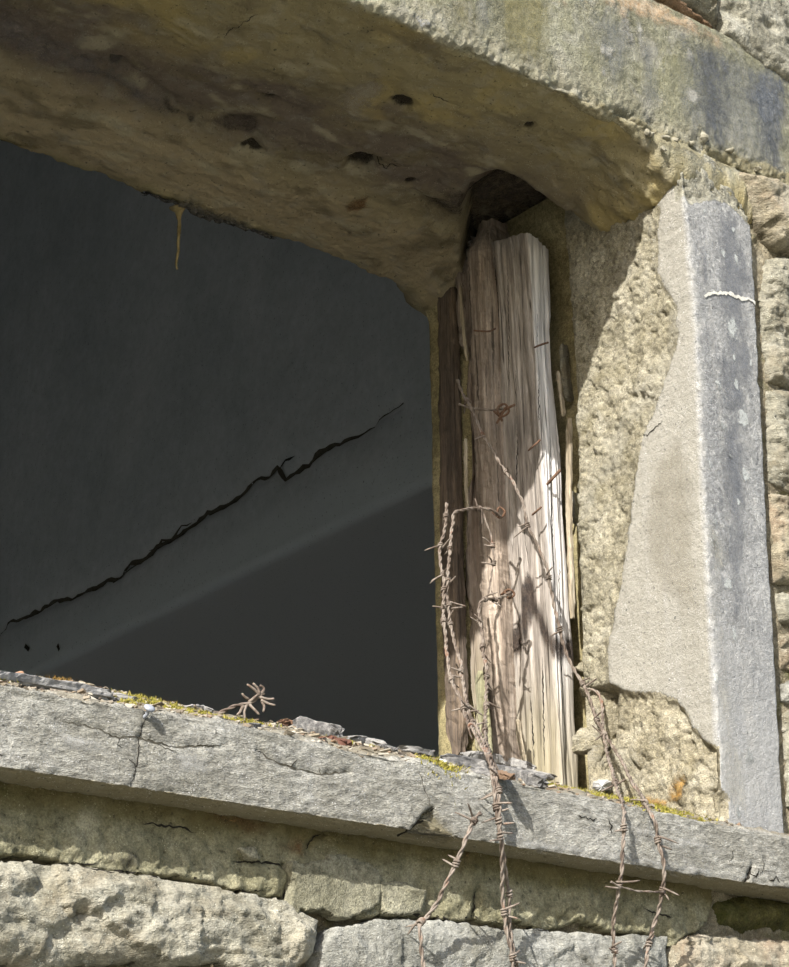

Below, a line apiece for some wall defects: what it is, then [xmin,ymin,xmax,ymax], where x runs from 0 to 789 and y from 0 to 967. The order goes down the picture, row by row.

damp [689,50,784,166]
crack [1,403,404,634]
spalling [565,205,730,821]
crack [57,720,225,786]
crack [397,772,434,837]